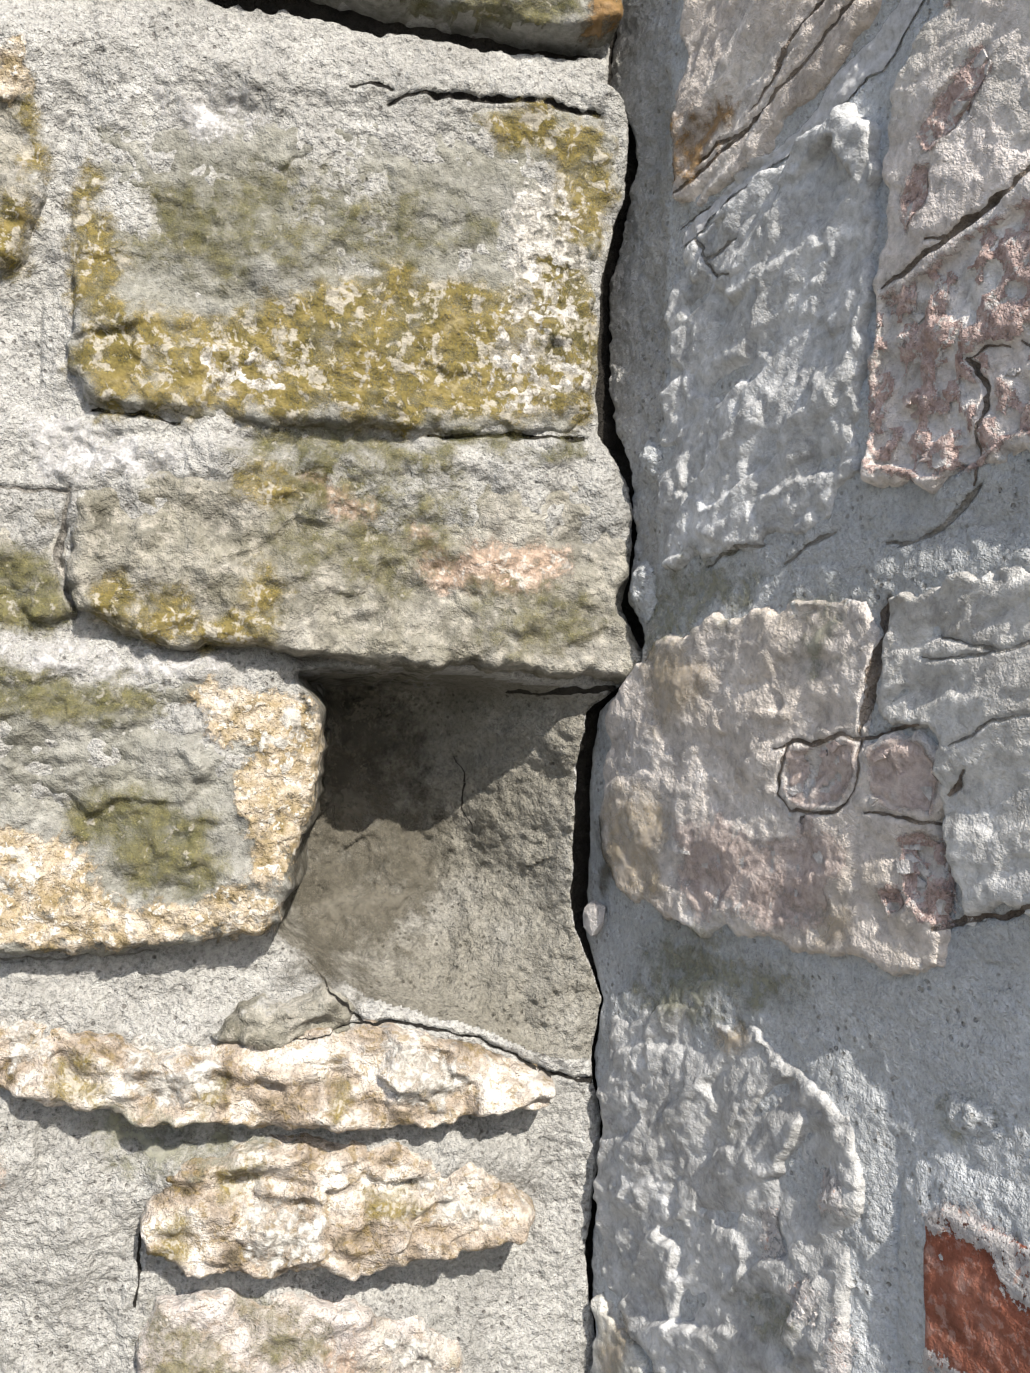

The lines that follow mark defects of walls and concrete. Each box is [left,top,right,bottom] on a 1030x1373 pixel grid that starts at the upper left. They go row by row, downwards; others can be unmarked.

crack [209,0,645,649]
crack [91,407,181,425]
crack [0,485,77,617]
crack [773,598,1030,829]
crack [0,949,153,961]
crack [293,685,620,1334]
crack [133,1232,142,1307]